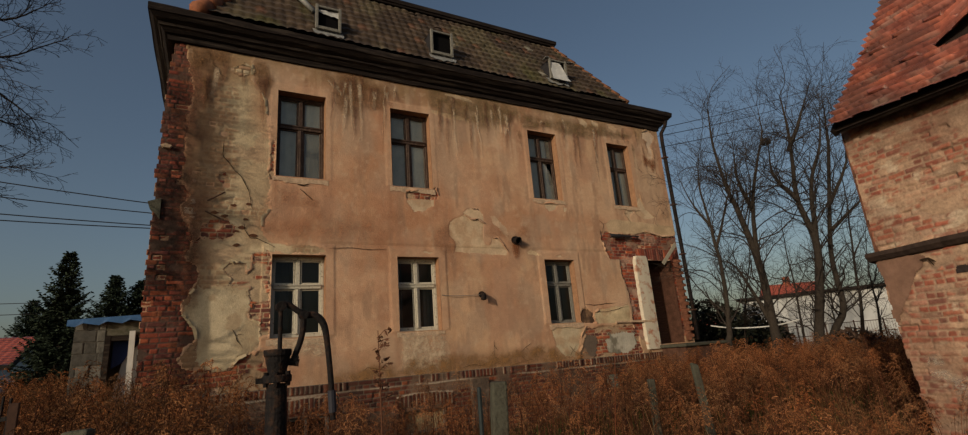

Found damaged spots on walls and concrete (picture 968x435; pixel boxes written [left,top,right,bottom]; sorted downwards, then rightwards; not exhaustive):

flaking render [135,43,325,401]
crack [223,144,274,247]
flaking render [406,187,440,212]
flaking render [449,206,509,255]
flaking render [552,194,693,359]
flaking render [877,254,925,322]